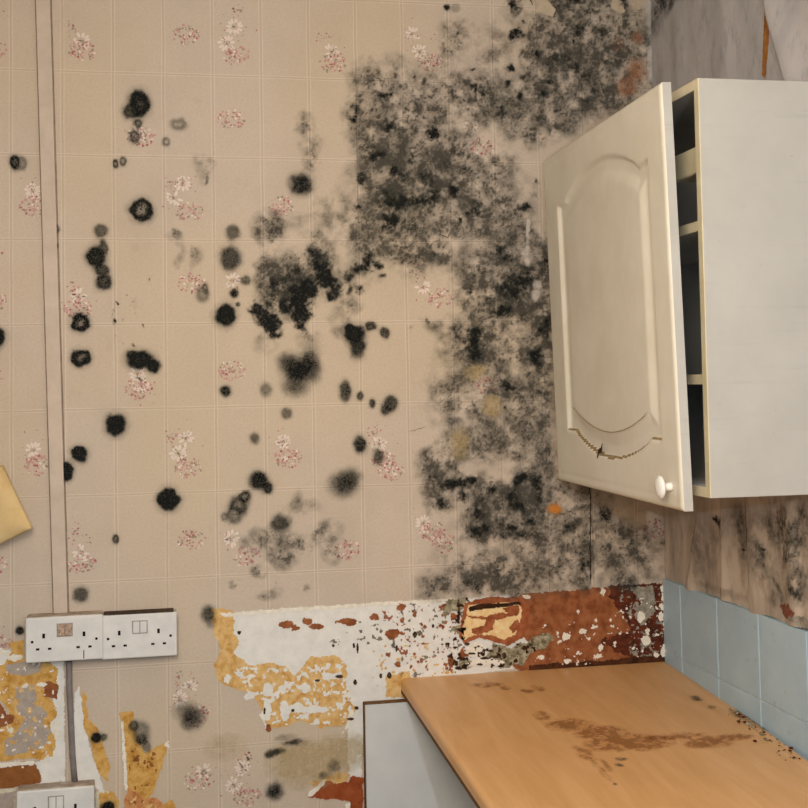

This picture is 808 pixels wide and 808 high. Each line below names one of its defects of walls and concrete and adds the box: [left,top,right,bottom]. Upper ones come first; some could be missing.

leakage [124,89,151,143]
leakage [128,197,153,222]
leakage [85,224,112,289]
leakage [215,0,673,670]
leakage [71,350,91,367]
leakage [126,344,161,373]
leakage [105,414,126,437]
leakage [63,446,87,481]
leakage [156,488,182,511]
peeling [6,661,41,676]
flaking render [224,583,666,808]
peeling [0,681,59,789]